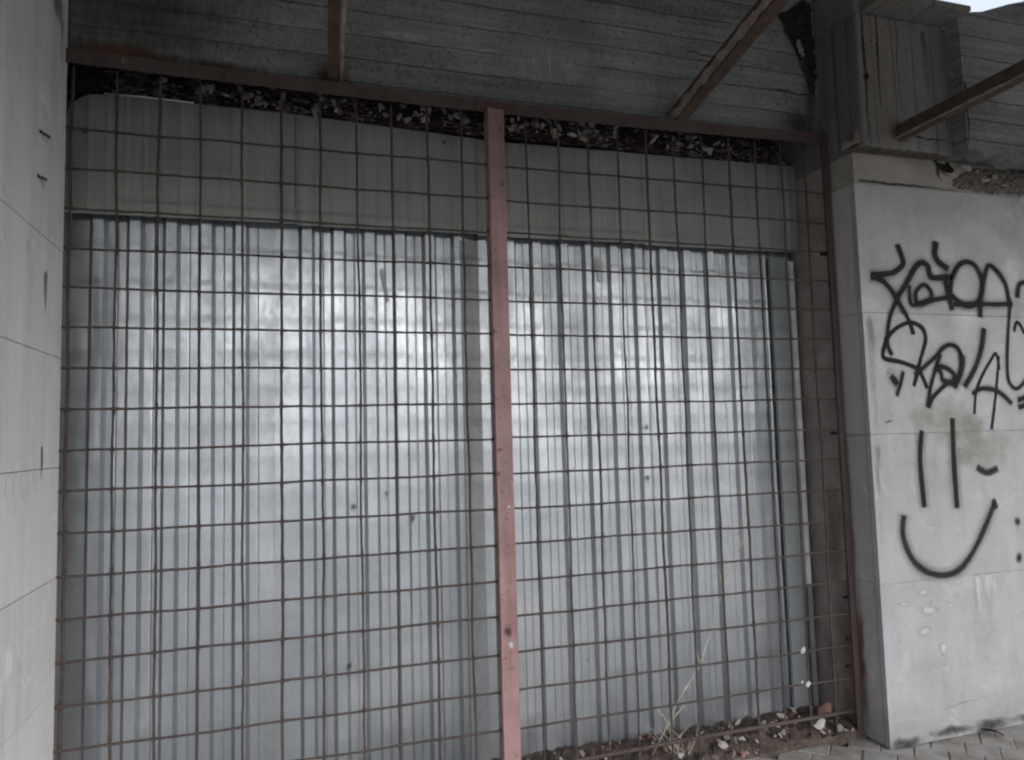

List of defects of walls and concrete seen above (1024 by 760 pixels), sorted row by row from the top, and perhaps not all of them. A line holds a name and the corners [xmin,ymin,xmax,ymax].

spalling [761,0,817,96]
crack [861,12,902,144]
crack [858,81,970,191]
flaking render [841,129,1024,197]
water stain [897,739,917,748]
water stain [982,720,1001,729]